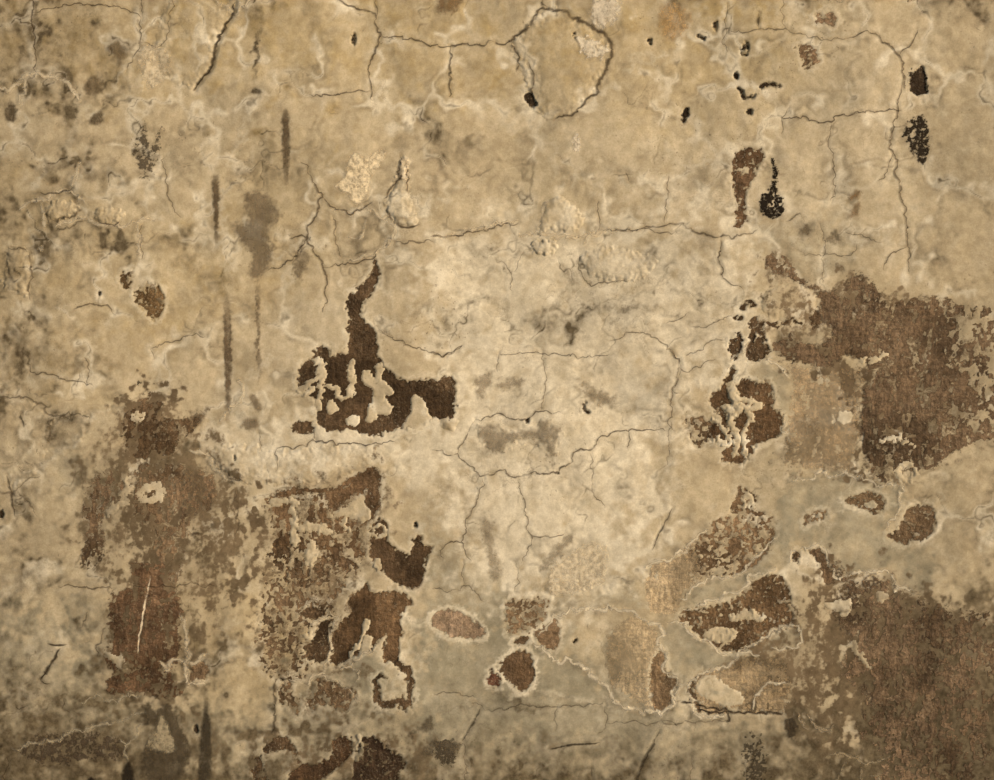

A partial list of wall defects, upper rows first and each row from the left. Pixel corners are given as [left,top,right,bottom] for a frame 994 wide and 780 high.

damp [108,42,125,64]
spalling [80,380,217,699]
spalling [254,466,438,721]
spalling [287,256,460,440]
crack [274,158,514,312]
crack [315,0,613,118]
crack [436,316,725,594]
damp [785,715,833,738]
spalling [643,486,994,780]
spalling [678,252,994,551]
crack [781,30,918,275]
damp [790,544,911,593]